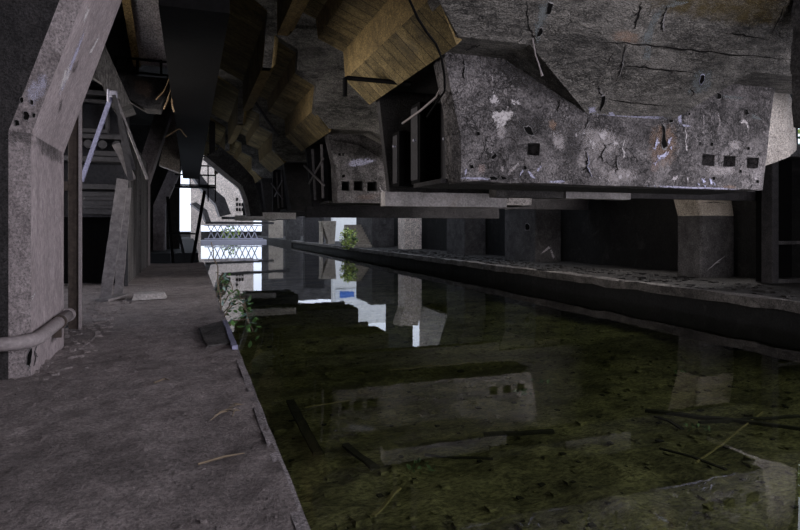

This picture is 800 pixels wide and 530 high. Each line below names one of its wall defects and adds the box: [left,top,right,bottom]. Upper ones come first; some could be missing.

crack [598,4,791,130]
spalling [14,97,36,127]
crack [583,143,619,176]
spalling [653,120,673,166]